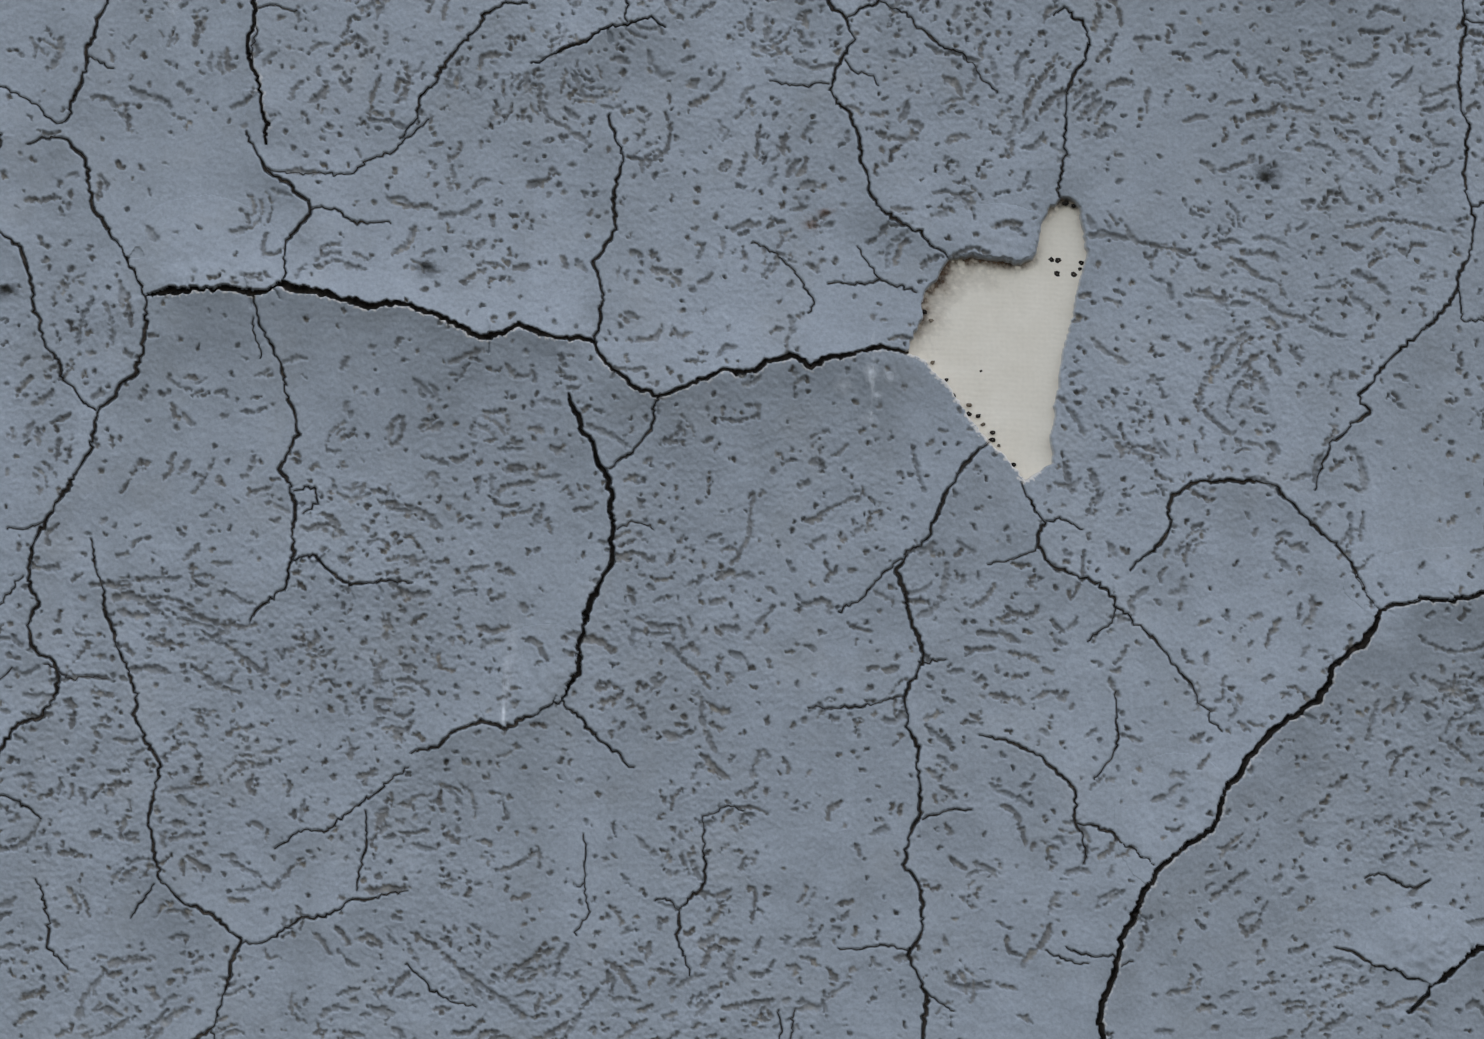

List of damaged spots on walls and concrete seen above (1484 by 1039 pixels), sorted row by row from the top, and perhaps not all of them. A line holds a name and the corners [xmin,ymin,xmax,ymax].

crack [0,0,917,1039]
crack [769,0,998,257]
crack [808,442,989,1039]
spalling [908,199,1087,480]
crack [979,0,1484,1039]